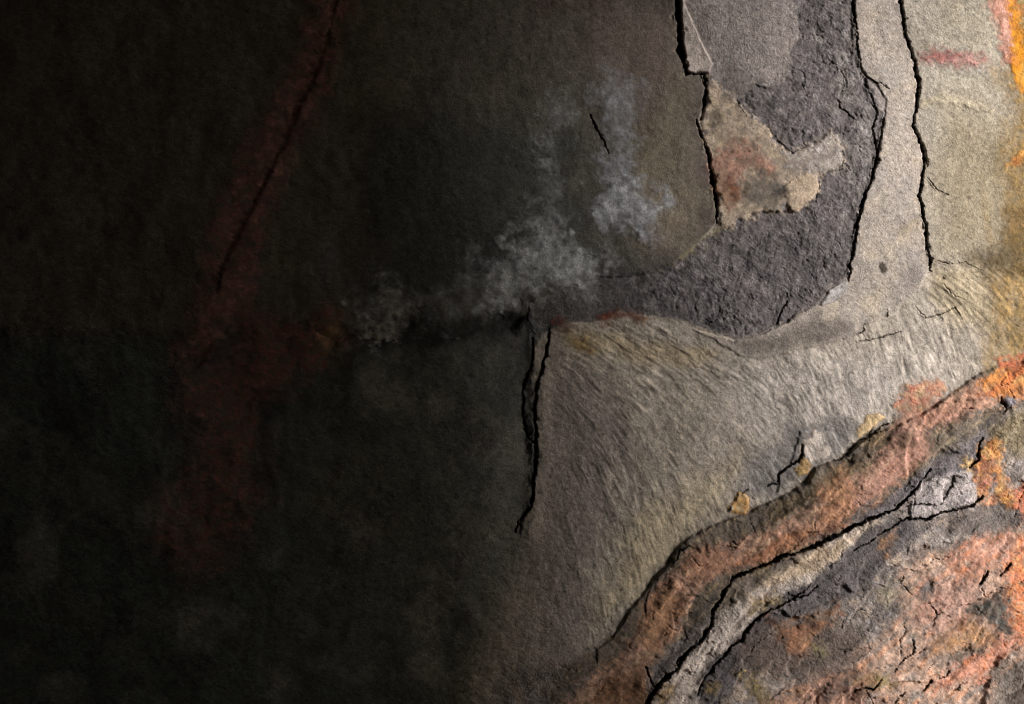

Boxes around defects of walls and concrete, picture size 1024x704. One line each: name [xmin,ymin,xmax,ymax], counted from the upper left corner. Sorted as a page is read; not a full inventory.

corrosion [989,0,1024,93]
leakage [438,217,597,321]
leakage [592,149,674,240]
spalling [583,0,885,337]
crack [898,0,978,318]
crack [515,334,550,532]
corrosion [550,354,1024,704]
crack [644,437,984,704]
crack [835,423,889,461]